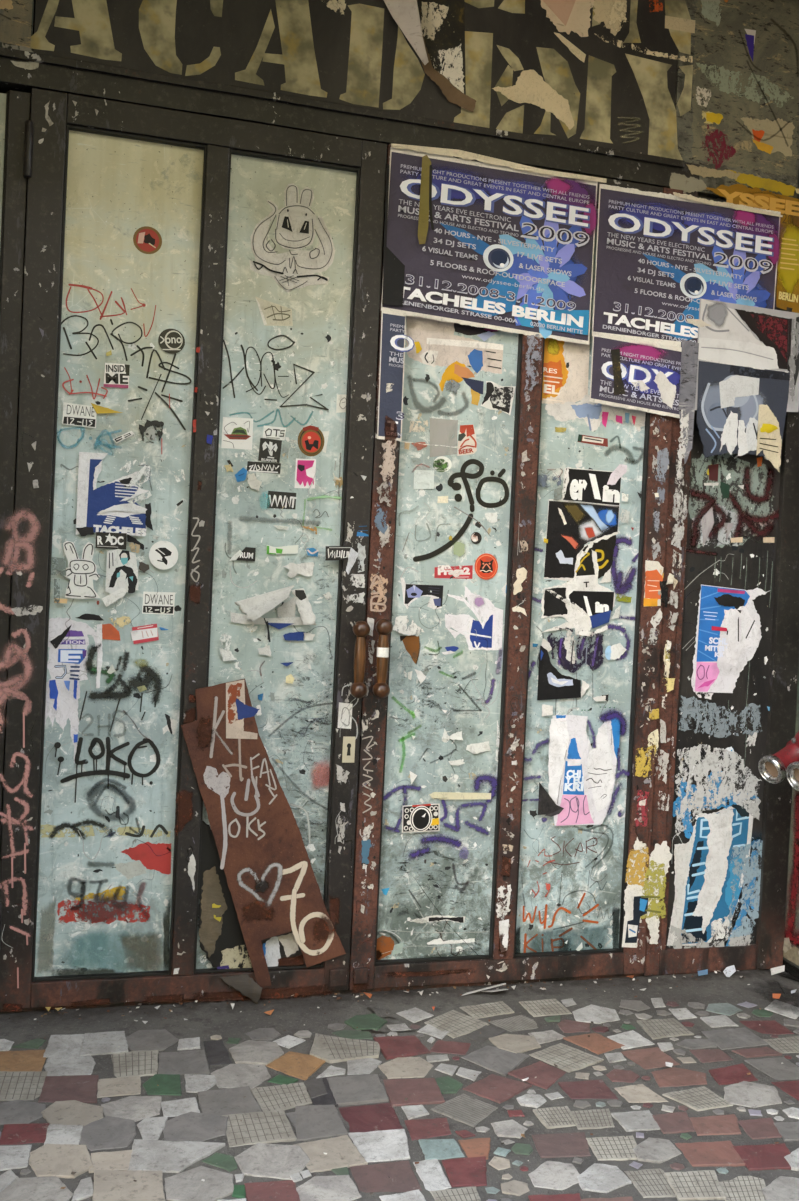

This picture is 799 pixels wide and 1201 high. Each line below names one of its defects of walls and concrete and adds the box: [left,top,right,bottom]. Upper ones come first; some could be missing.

corrosion [174,790,193,835]
corrosion [499,934,507,957]
corrosion [146,984,331,1004]